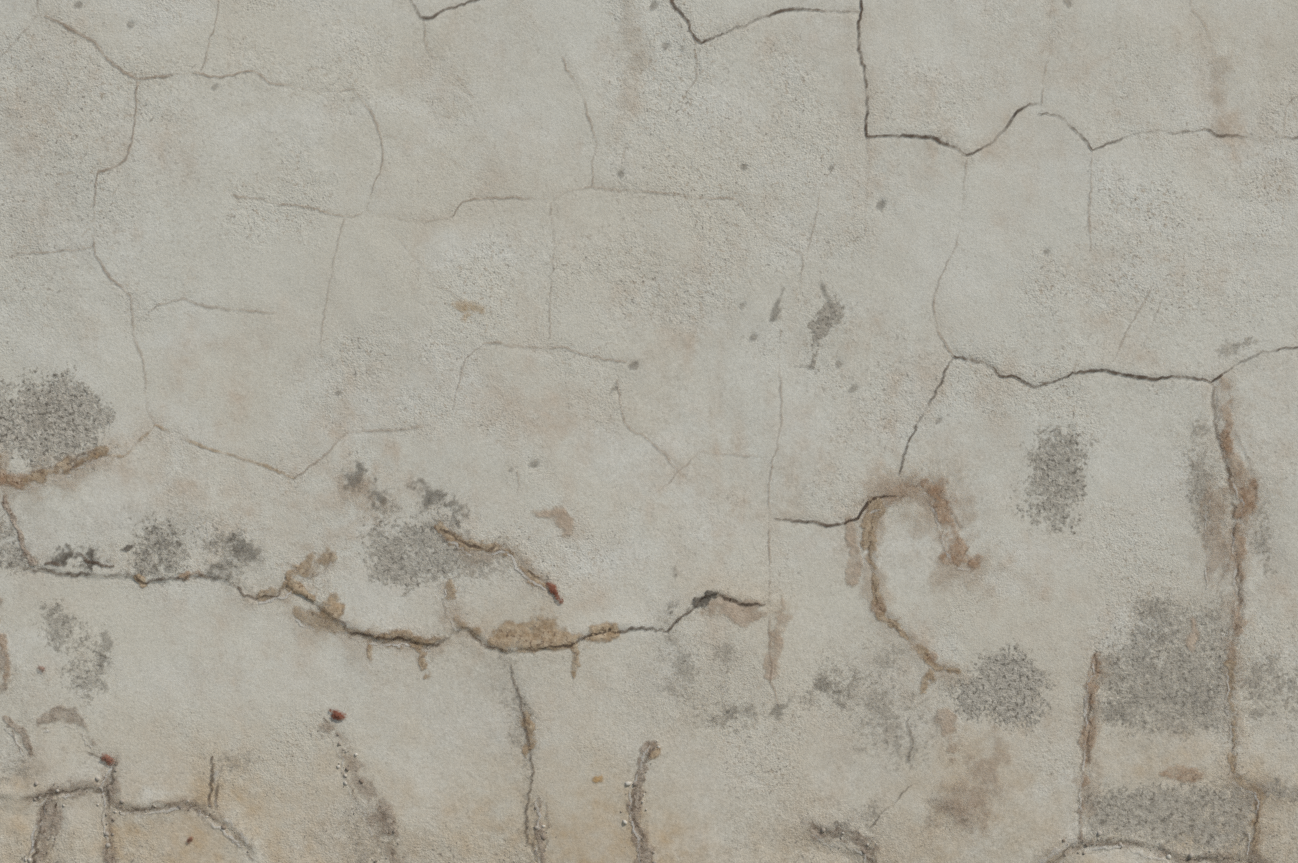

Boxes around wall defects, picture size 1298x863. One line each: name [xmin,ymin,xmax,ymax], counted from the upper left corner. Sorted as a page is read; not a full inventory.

crack [422,0,477,19]
crack [671,0,723,43]
crack [770,7,822,15]
crack [857,0,982,155]
crack [1007,103,1116,150]
crack [935,342,1223,392]
corrosion [922,480,979,569]
crack [1187,420,1256,588]
crack [776,433,960,760]
crack [24,511,789,863]
crack [1050,652,1298,863]
crack [811,800,881,863]